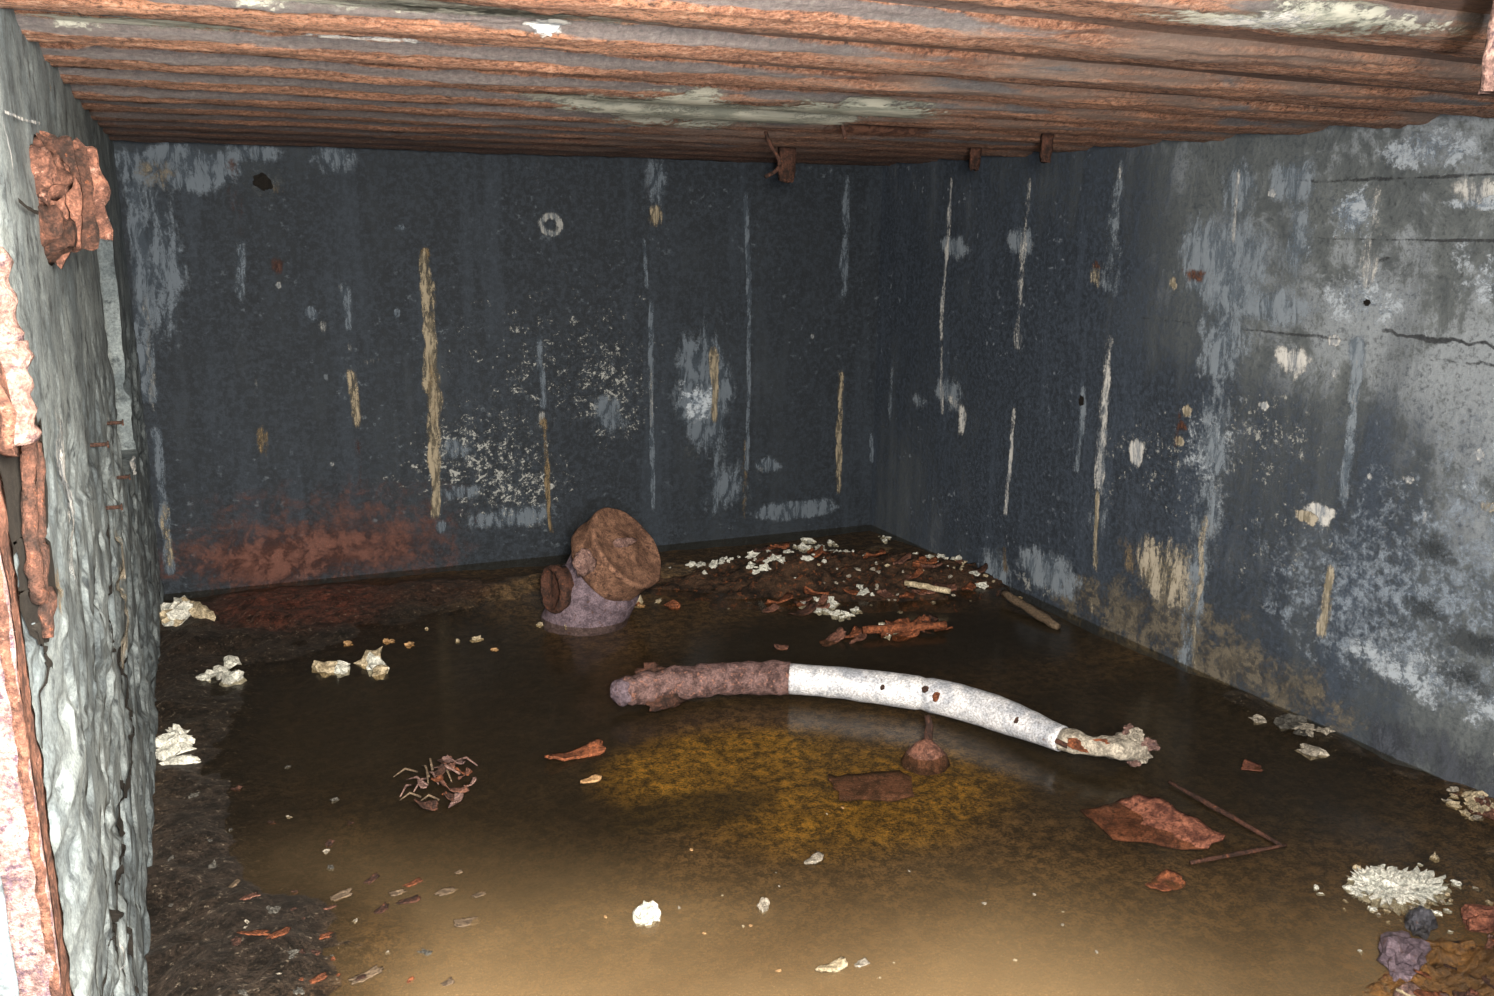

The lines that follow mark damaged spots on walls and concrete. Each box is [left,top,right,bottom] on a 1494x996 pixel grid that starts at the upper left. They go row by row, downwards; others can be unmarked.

rust [29,134,77,266]
leakage [310,147,356,172]
leakage [518,86,946,130]
leakage [839,177,850,296]
rust [822,124,936,137]
leakage [1379,127,1494,211]
leakage [408,160,844,534]
crack [1384,329,1494,366]
leakage [984,160,1494,732]
rust [199,513,414,584]
crack [32,622,53,748]
crack [102,524,140,996]